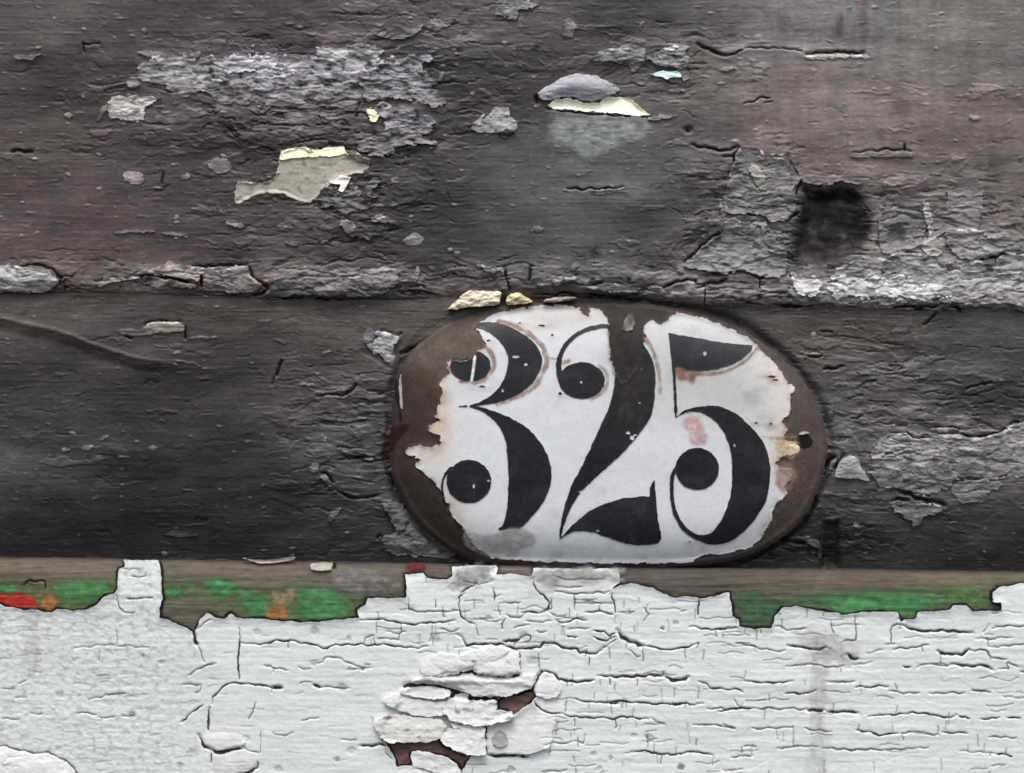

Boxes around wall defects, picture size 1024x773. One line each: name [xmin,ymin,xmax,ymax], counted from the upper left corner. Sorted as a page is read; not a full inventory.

crack [698,45,861,56]
peeling [96,16,455,240]
peeling [684,146,1024,311]
peeling [0,261,420,301]
corrosion [447,348,496,384]
corrosion [602,305,666,422]
corrosion [676,353,752,381]
corrosion [776,436,797,490]
peeling [825,420,1024,527]
crack [116,568,151,614]
crack [182,576,1024,773]
crack [0,745,77,773]